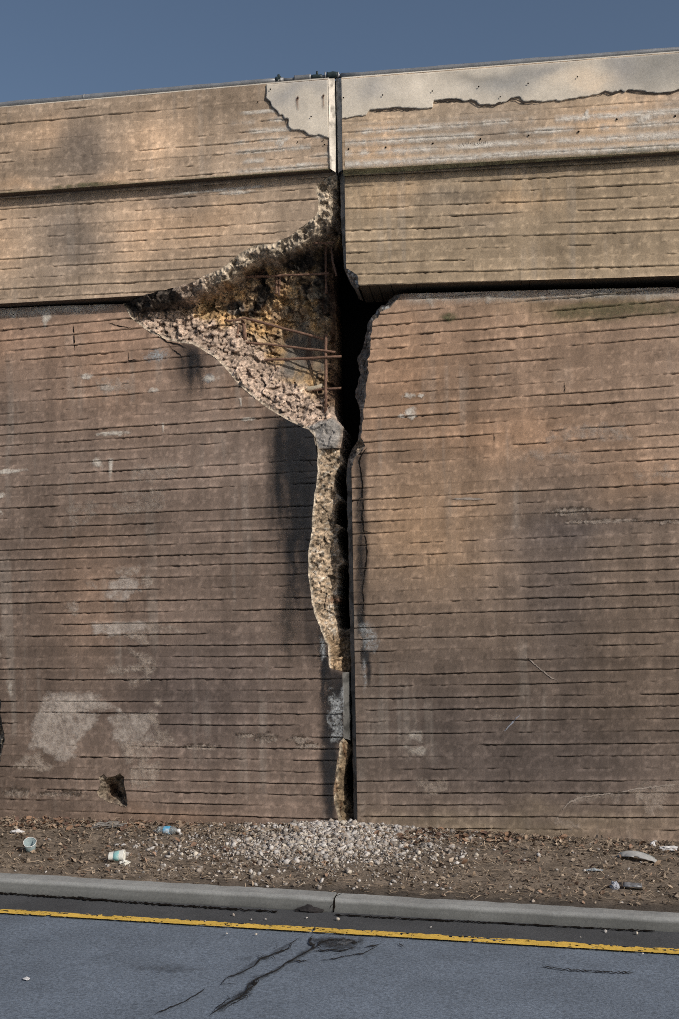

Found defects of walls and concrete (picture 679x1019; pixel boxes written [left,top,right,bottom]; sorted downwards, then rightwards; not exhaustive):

flaking render [265,80,329,138]
flaking render [341,53,679,119]
leakage [181,347,214,382]
spalling [123,175,401,672]
leakage [272,418,318,610]
crack [357,448,371,610]
peeling [92,622,152,644]
peeling [18,693,173,807]
crack [156,894,655,1015]